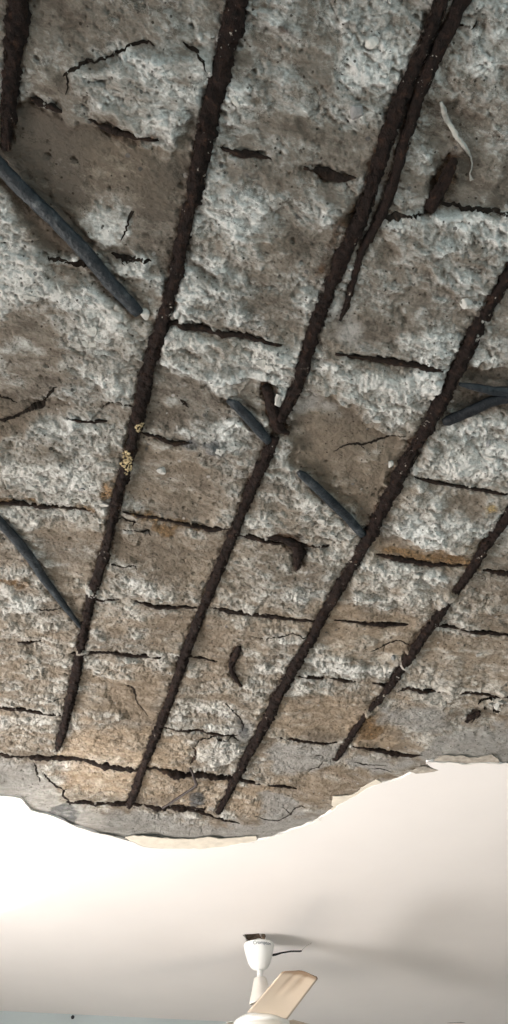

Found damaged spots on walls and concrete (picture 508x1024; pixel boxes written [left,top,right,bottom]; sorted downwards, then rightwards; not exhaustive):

crack [63,39,154,95]
spalling [286,0,508,530]
spalling [0,0,433,841]
rust [84,479,116,513]
crack [118,516,151,536]
rust [131,510,201,537]
spalling [66,289,508,839]
rust [383,546,480,569]
crack [34,763,71,805]
peeling [125,835,257,849]